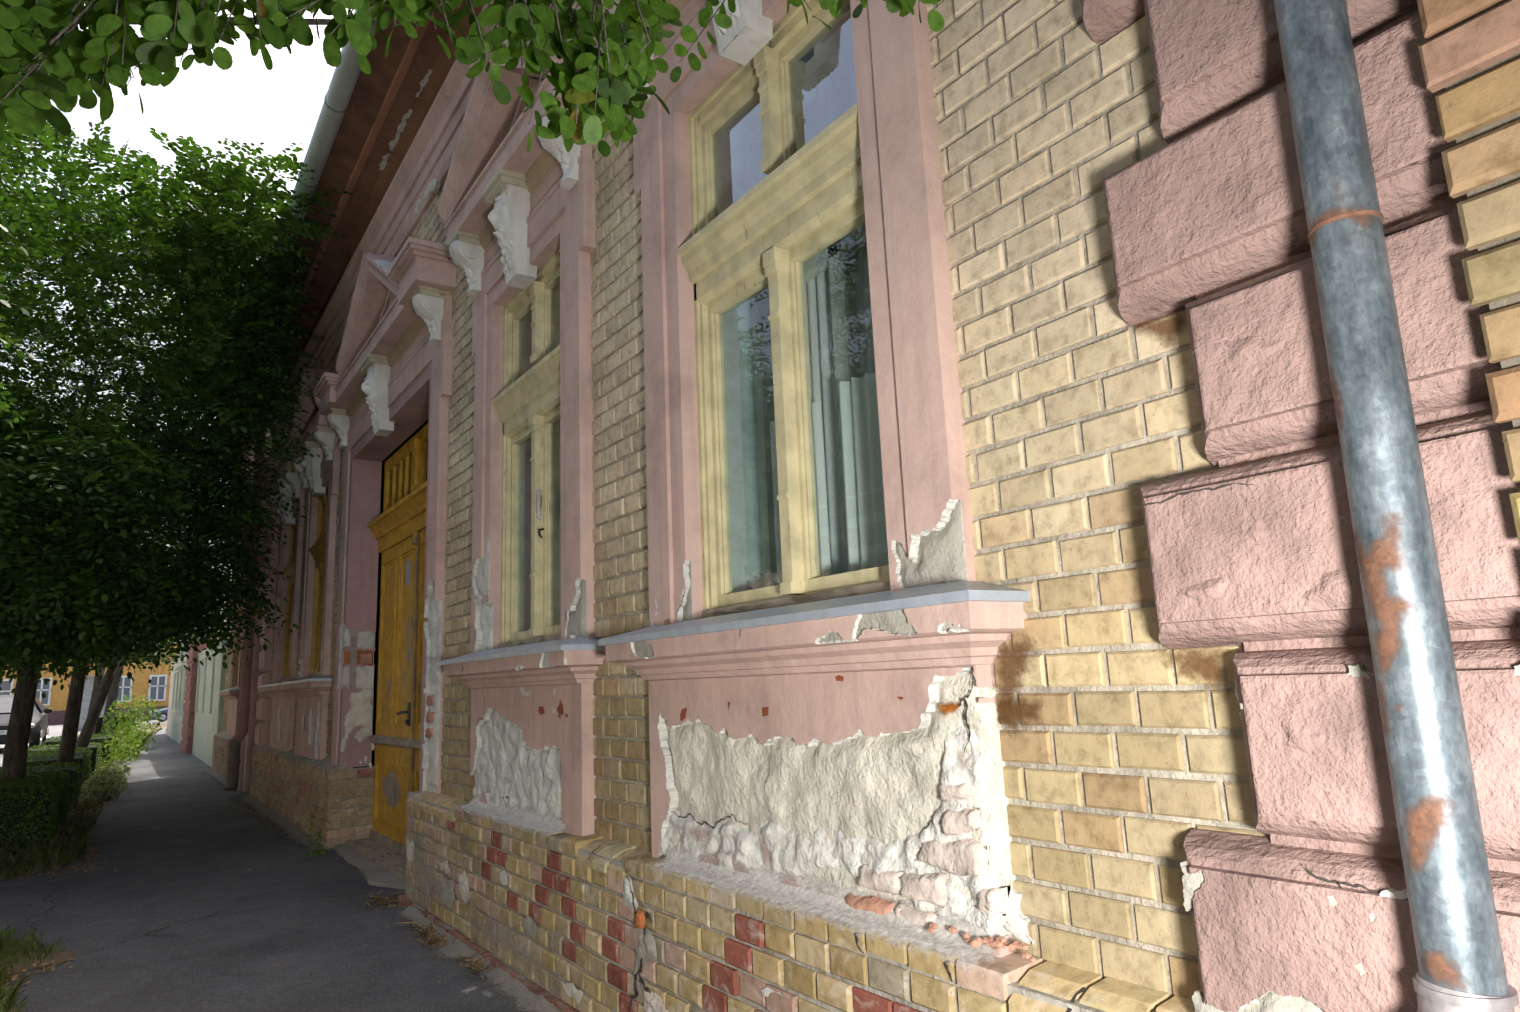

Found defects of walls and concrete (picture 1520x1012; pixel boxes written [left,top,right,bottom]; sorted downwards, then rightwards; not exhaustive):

water stain [1135,309,1186,341]
spalling [896,500,967,588]
rust [1357,515,1410,731]
spalling [340,592,442,808]
crack [957,673,973,753]
water stain [996,642,1038,726]
water stain [1172,650,1223,685]
spalling [660,669,1035,944]
rust [1408,797,1447,869]
crack [1305,864,1381,893]
crack [1067,988,1088,1012]
rust [1425,953,1458,983]